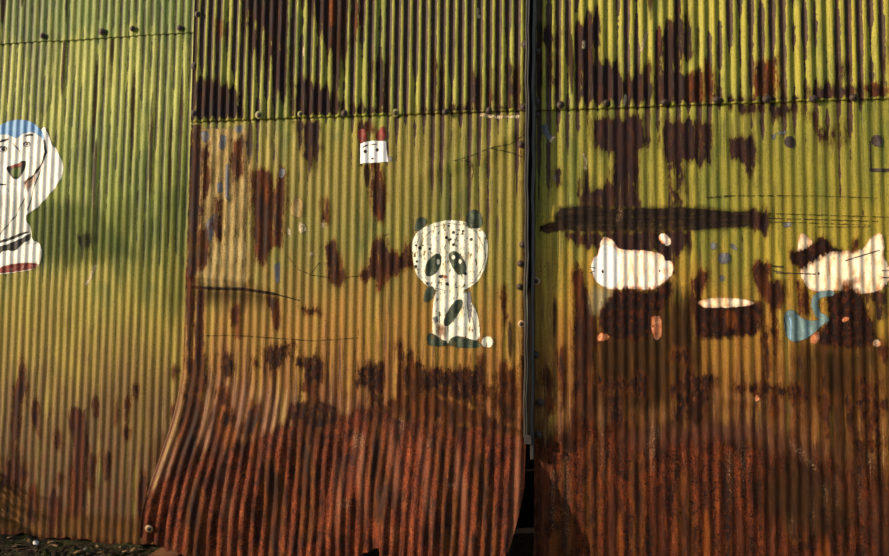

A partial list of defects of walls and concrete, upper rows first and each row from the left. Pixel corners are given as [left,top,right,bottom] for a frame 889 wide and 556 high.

corrosion [536,0,716,209]
corrosion [729,133,756,178]
corrosion [728,56,888,120]
corrosion [812,110,849,144]
corrosion [0,0,526,556]
corrosion [534,259,889,556]